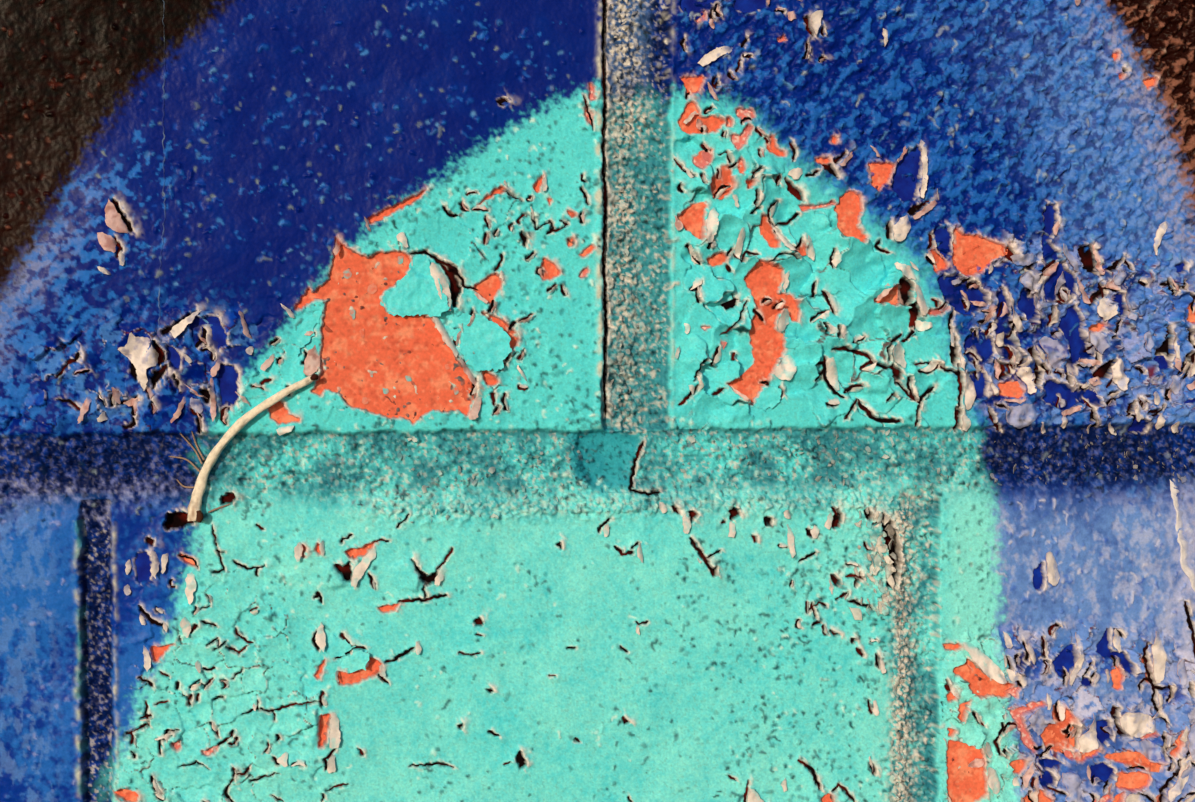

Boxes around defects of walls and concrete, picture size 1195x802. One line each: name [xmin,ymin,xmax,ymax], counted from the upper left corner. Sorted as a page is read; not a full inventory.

peeling [97,200,133,275]
peeling [443,174,593,296]
peeling [674,39,1195,488]
peeling [56,232,589,523]
peeling [124,537,198,686]
peeling [336,534,389,590]
peeling [312,622,422,684]
peeling [380,548,453,611]
crack [598,518,643,563]
crack [629,443,720,576]
spalling [795,507,911,802]
peeling [941,624,1195,802]